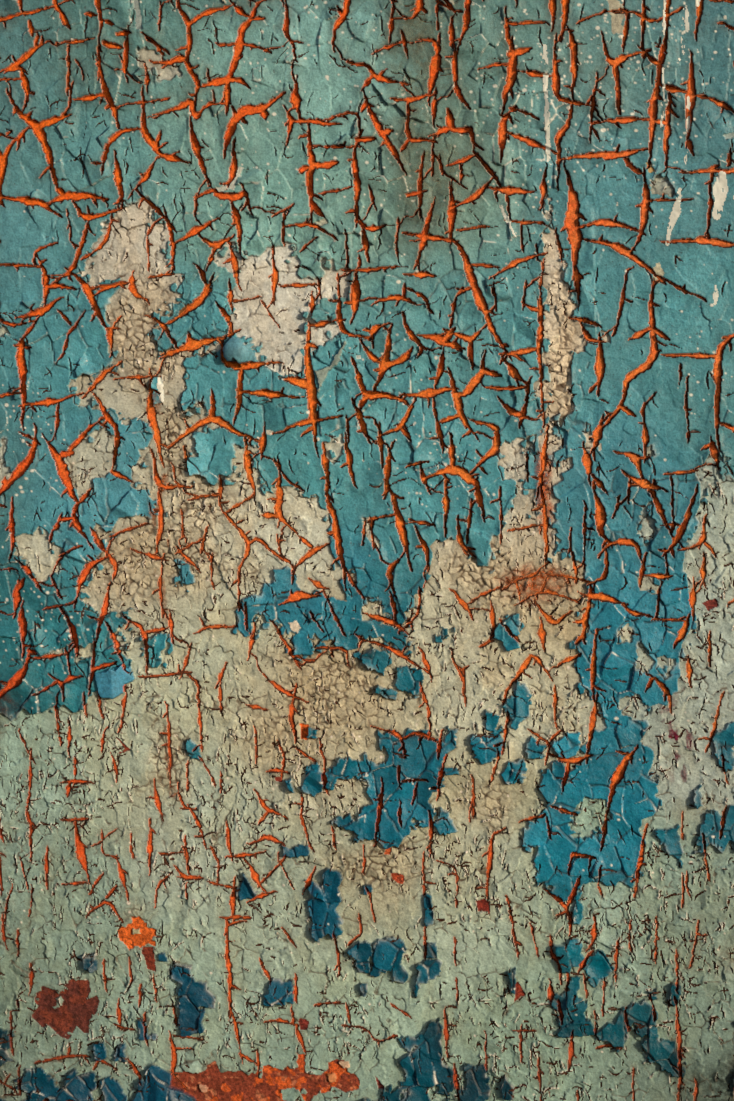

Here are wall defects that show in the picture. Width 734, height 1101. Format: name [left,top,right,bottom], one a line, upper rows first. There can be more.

crack [679,365,701,444]
peeling [0,192,680,1101]
peeling [552,449,734,1101]
crack [555,852,597,878]
crack [17,929,115,1012]
rust [32,979,103,1040]
crack [34,952,209,1101]
rust [118,917,157,973]
rust [169,1054,360,1101]
crack [317,900,365,995]
crack [310,988,405,1061]
crack [440,975,513,1101]